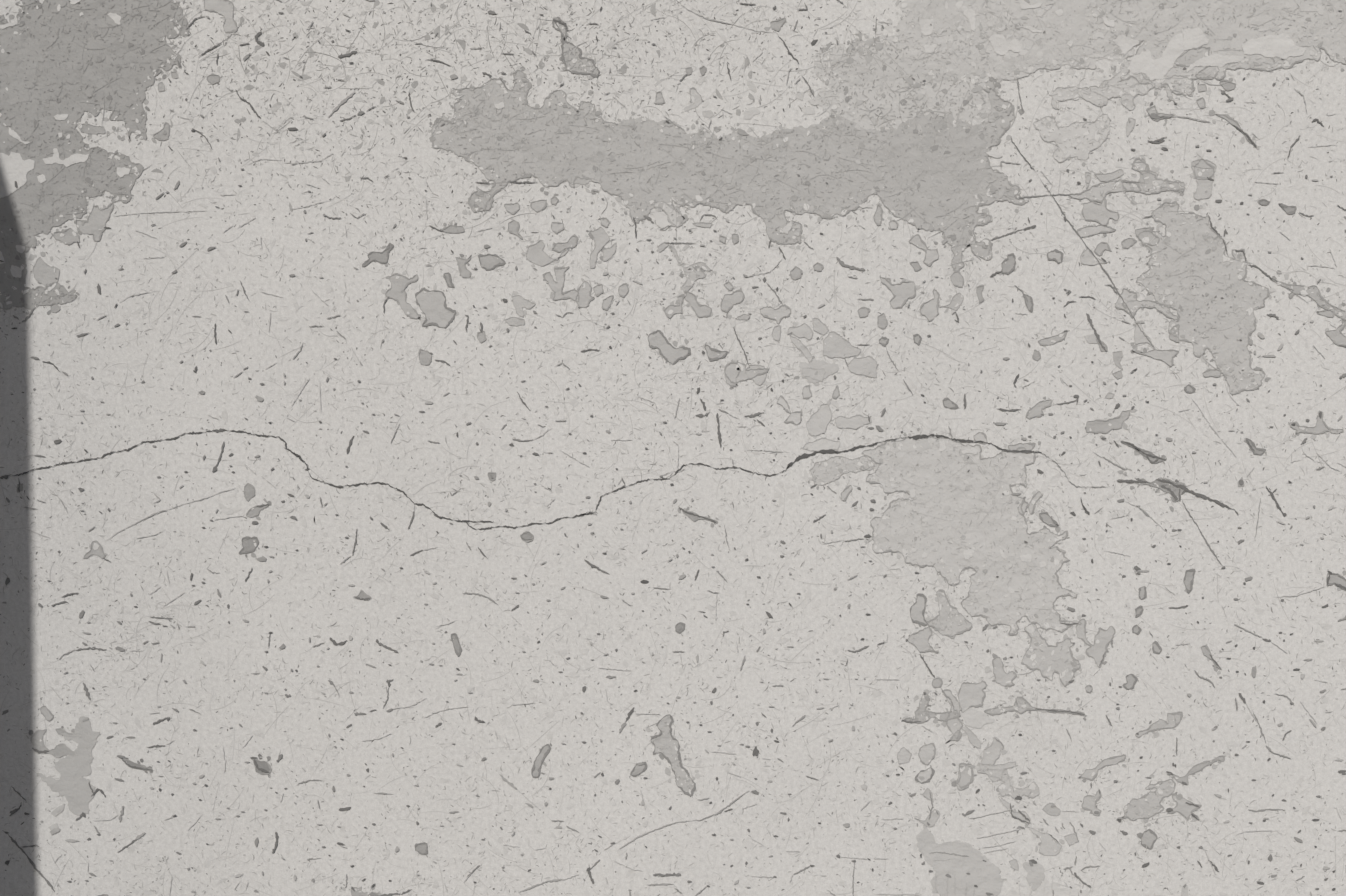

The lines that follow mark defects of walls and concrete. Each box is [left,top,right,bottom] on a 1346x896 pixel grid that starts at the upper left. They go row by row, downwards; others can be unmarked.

peeling [206,73,220,84]
peeling [0,0,190,313]
crack [4,429,1105,530]
peeling [431,0,1346,870]
peeling [415,842,428,855]